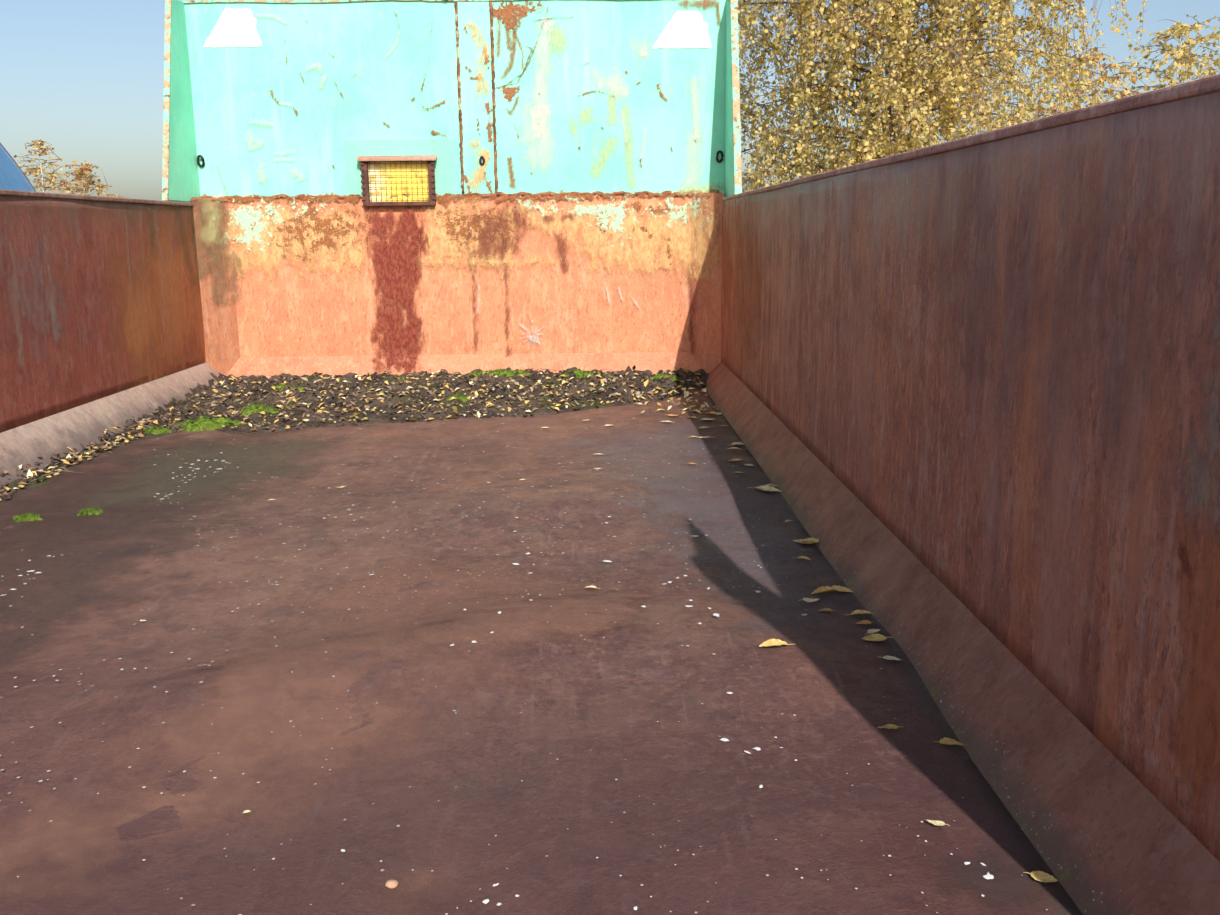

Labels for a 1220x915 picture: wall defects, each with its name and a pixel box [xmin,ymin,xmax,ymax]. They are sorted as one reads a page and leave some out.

peeling [212,192,373,278]
peeling [526,18,554,169]
peeling [421,78,718,280]
corrosion [435,0,723,346]